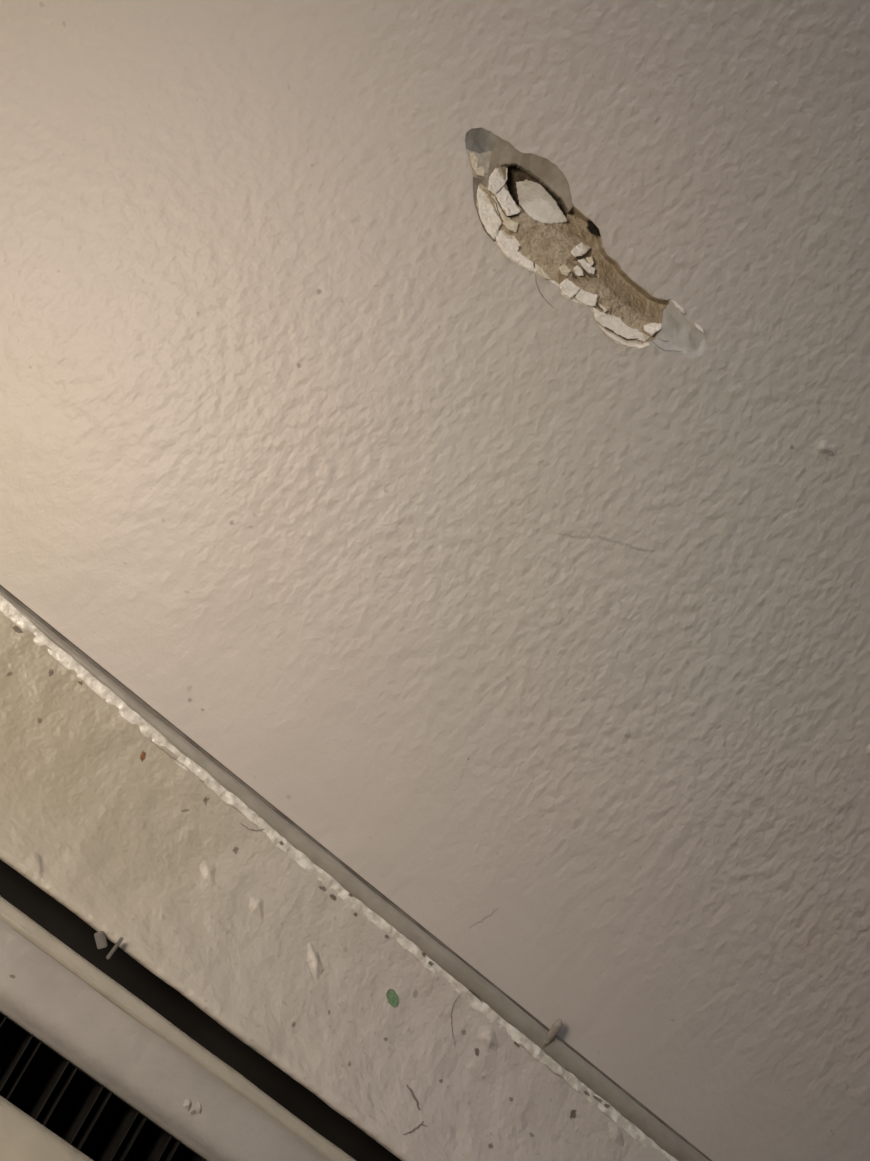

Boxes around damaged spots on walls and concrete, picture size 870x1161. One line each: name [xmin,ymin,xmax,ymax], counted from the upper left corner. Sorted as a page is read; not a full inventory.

spalling [465,128,708,358]